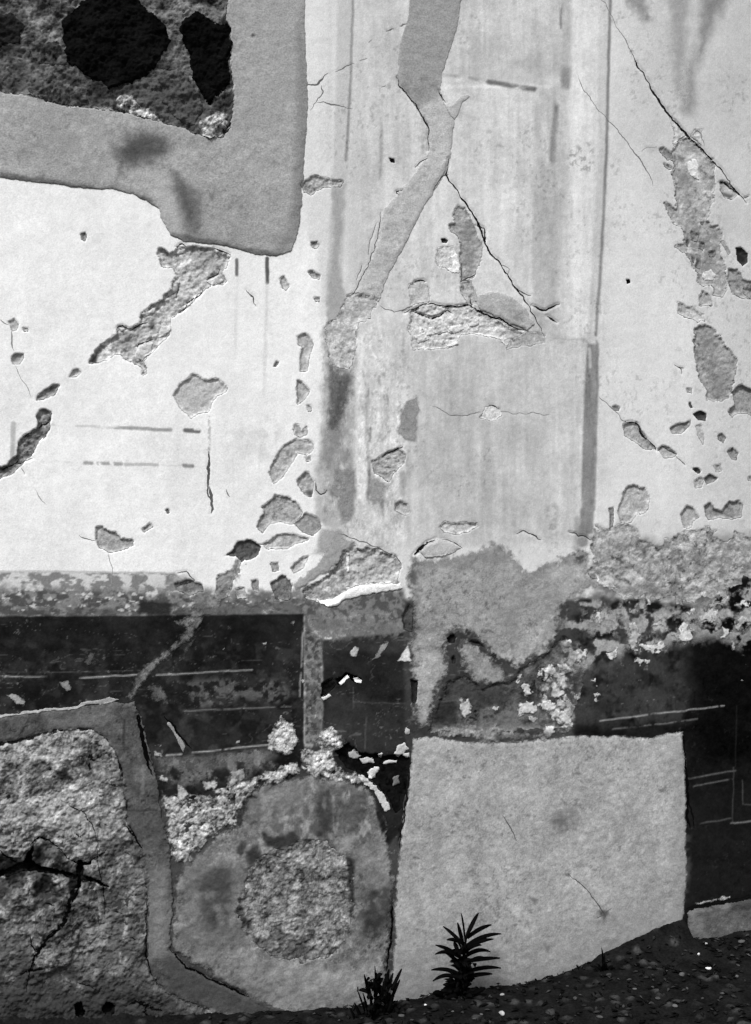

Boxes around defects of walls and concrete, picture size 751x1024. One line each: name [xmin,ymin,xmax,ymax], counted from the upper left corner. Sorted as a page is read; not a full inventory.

crack [306,23,407,109]
crack [578,1,748,203]
spalling [0,243,230,479]
crack [206,451,230,513]
spalling [215,424,406,607]
water stain [319,365,355,553]
crack [382,77,558,335]
spalling [408,205,545,351]
spalling [428,485,751,735]
spalling [659,118,751,445]
spalling [154,717,410,862]
crack [0,806,249,1002]